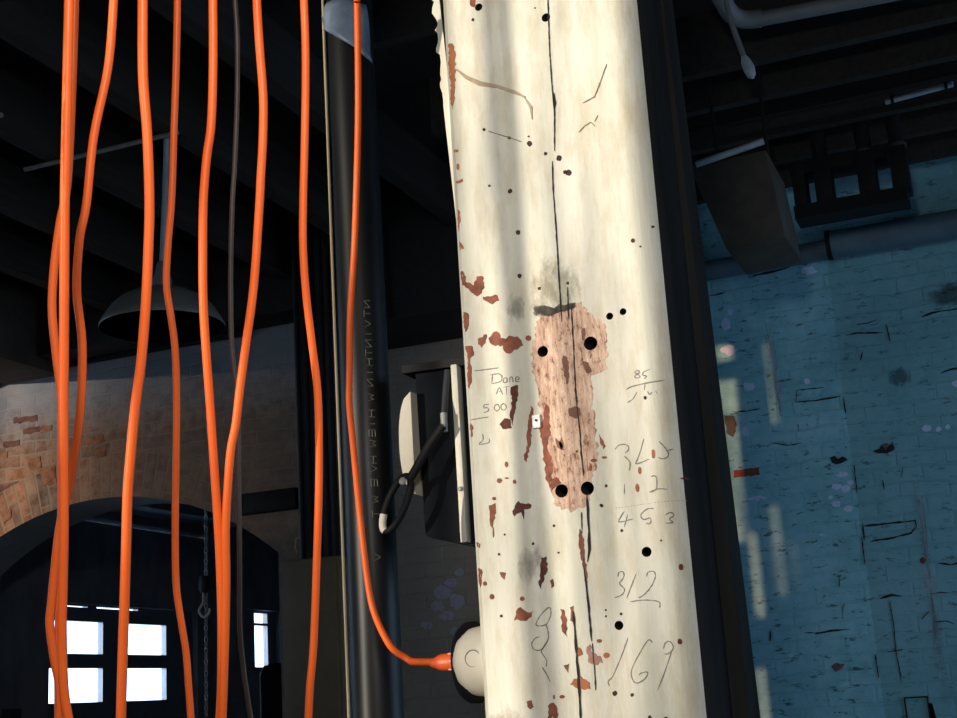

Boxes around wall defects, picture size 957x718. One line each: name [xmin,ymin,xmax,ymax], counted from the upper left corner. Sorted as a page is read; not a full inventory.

spalling [465,302,608,513]
crack [547,0,596,718]
crack [875,594,902,678]
crack [861,520,917,563]